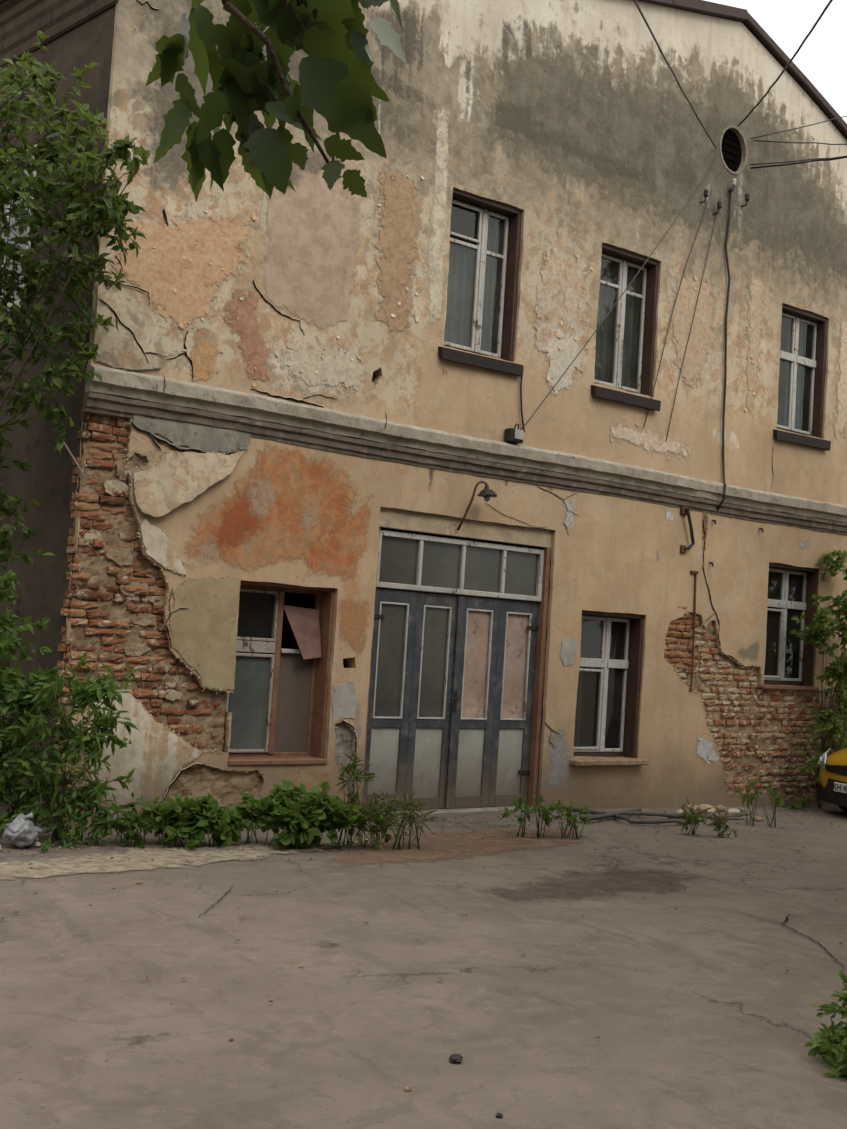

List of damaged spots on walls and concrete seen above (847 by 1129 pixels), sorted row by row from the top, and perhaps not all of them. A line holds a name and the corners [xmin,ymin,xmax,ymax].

crack [99,255,194,394]
damp [134,9,214,189]
peeling [109,210,373,393]
crack [253,280,305,335]
damp [288,48,308,85]
damp [260,152,362,328]
peeling [374,166,425,338]
damp [428,109,450,323]
peeling [532,245,593,396]
damp [489,21,847,282]
flaking render [52,395,265,807]
flaking render [664,606,844,800]